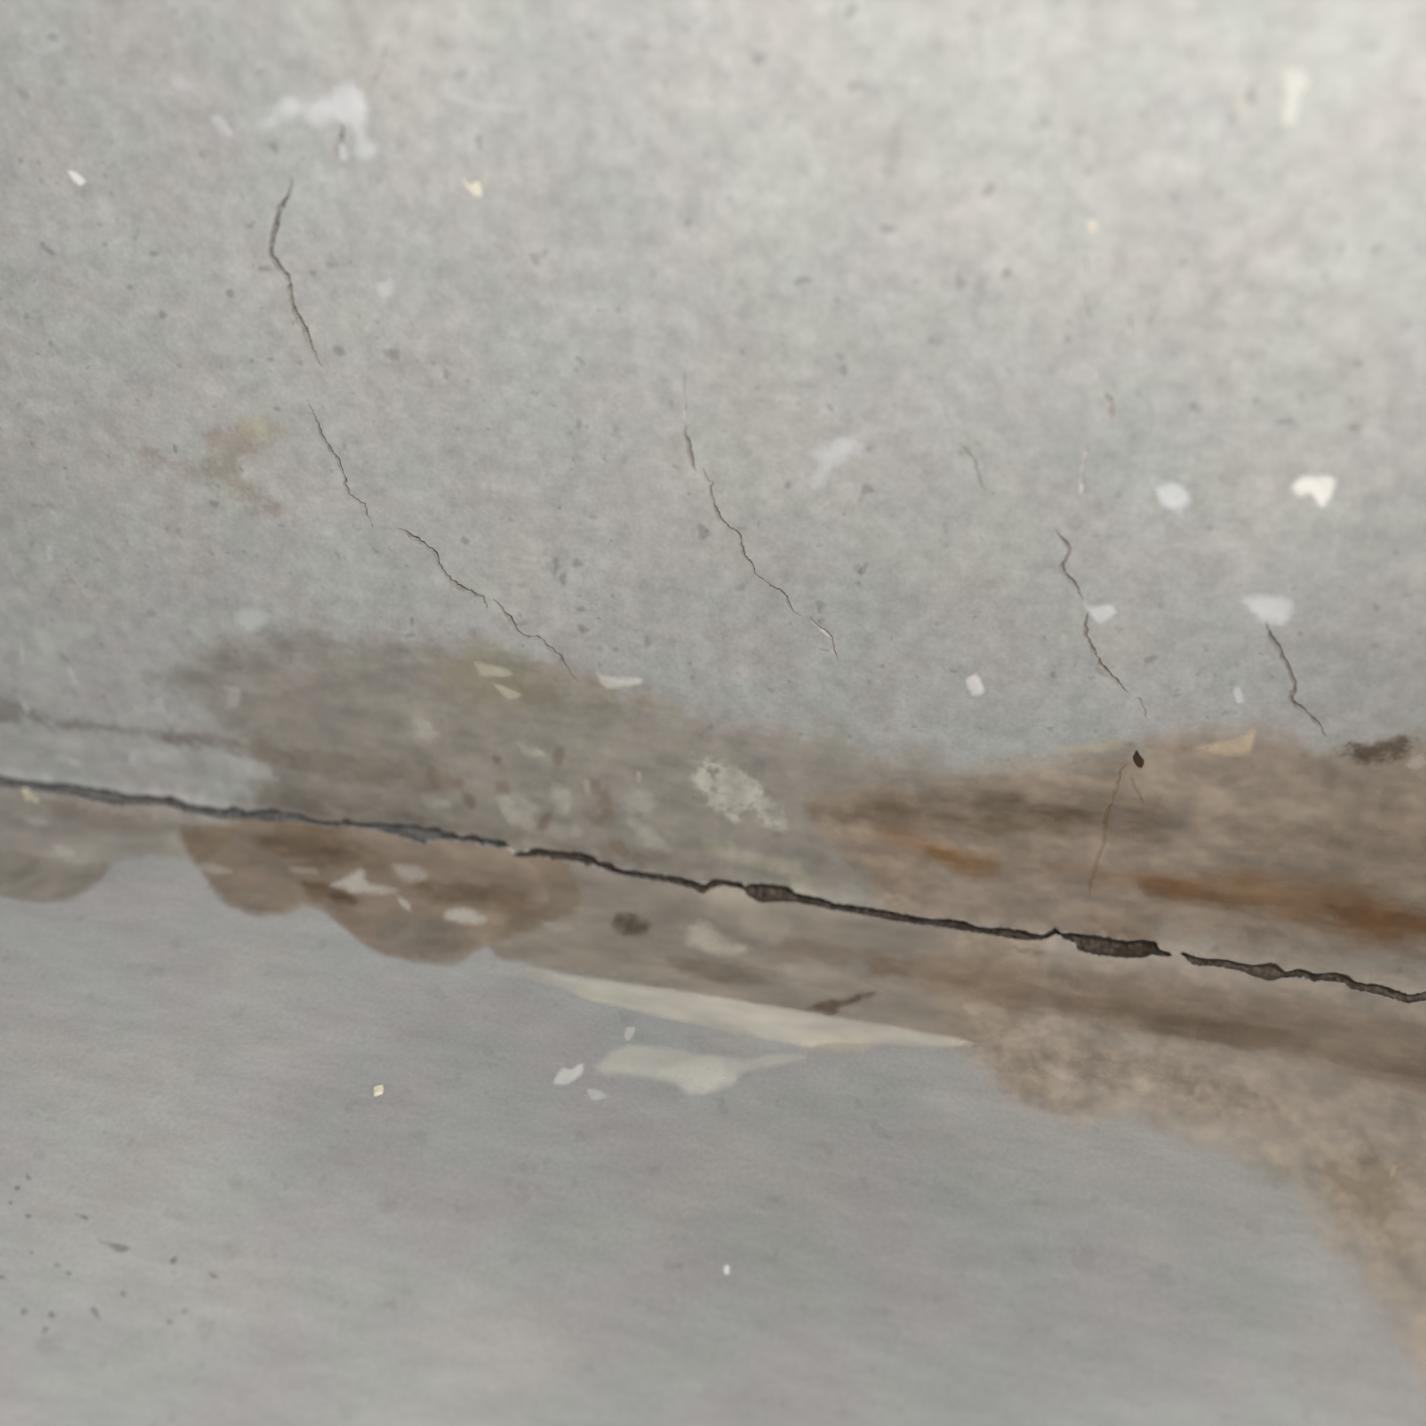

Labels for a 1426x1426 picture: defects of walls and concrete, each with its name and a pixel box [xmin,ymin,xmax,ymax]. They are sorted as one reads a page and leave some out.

crack [333,123,344,158]
crack [269,177,322,367]
crack [308,403,579,683]
crack [682,372,838,662]
crack [1055,529,1147,719]
crack [1265,618,1368,765]
crack [0,775,1426,1004]
damp [820,737,1426,956]